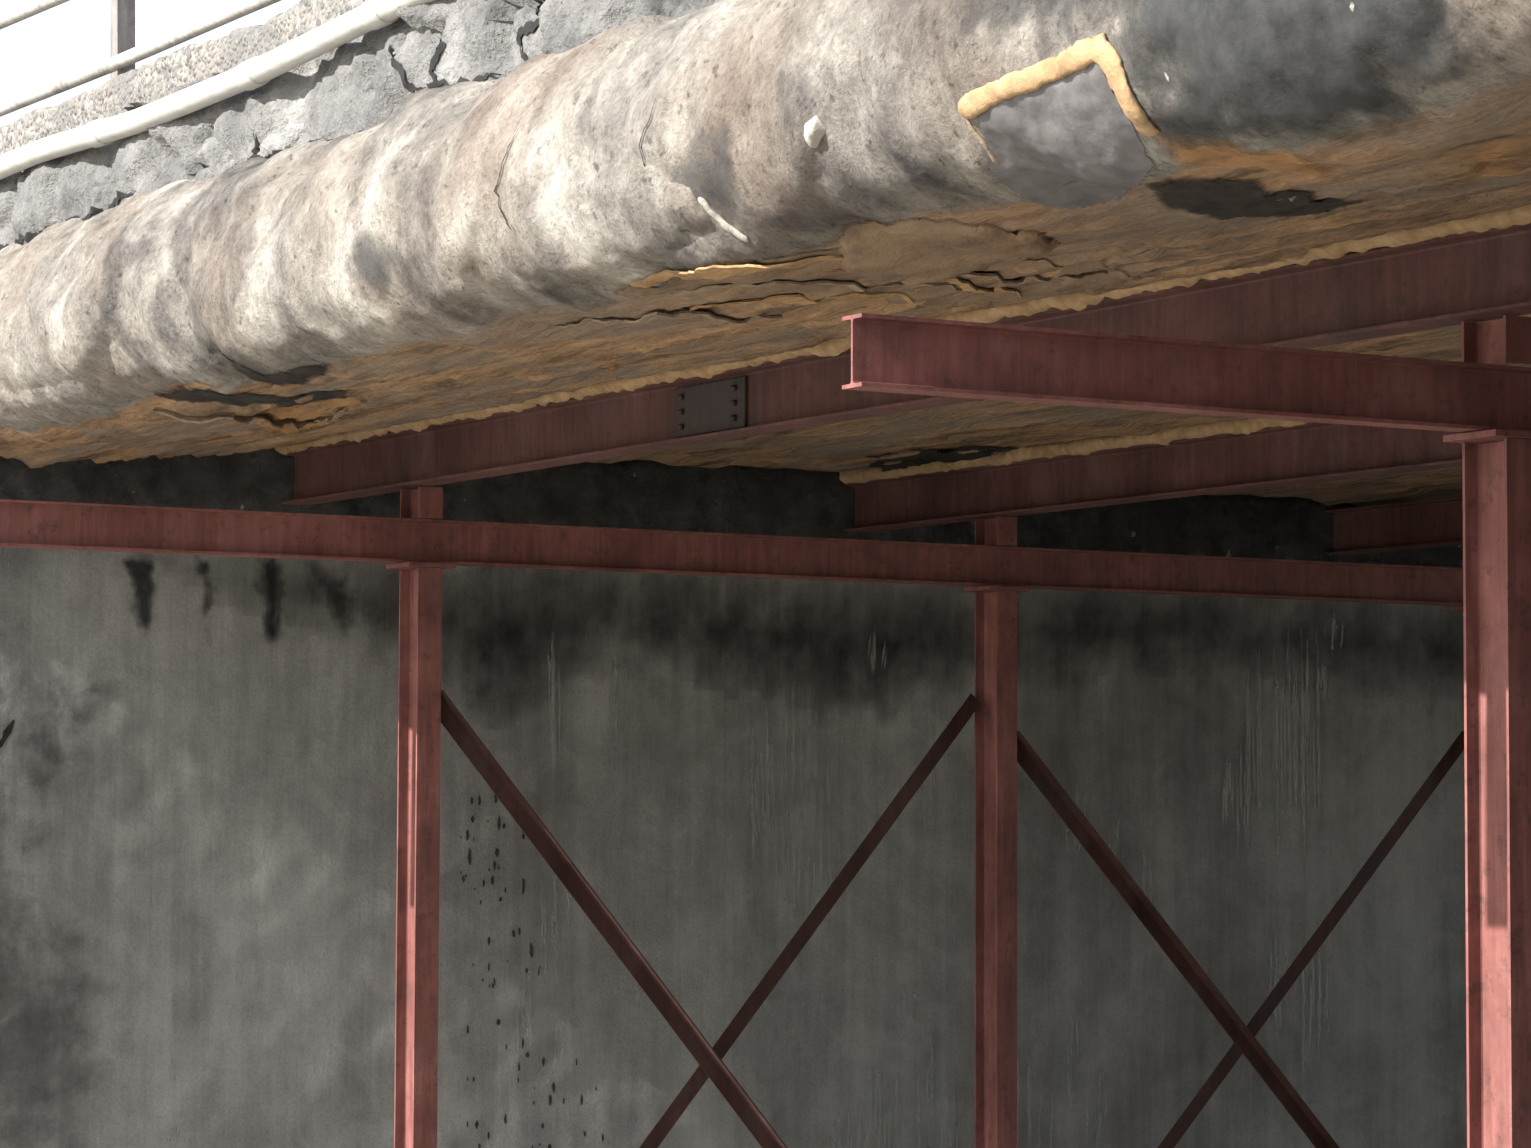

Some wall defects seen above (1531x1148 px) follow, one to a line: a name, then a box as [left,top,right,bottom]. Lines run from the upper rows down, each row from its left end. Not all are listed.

crack [388,0,545,93]
leakage [1120,0,1454,141]
spalling [1146,141,1360,220]
peeling [552,217,1142,331]
spalling [152,354,373,436]
spalling [865,446,1017,472]
leakage [124,559,154,627]
leakage [264,562,279,640]
leakage [1222,654,1332,843]
leakage [496,882,597,1105]
leakage [1270,941,1329,1069]